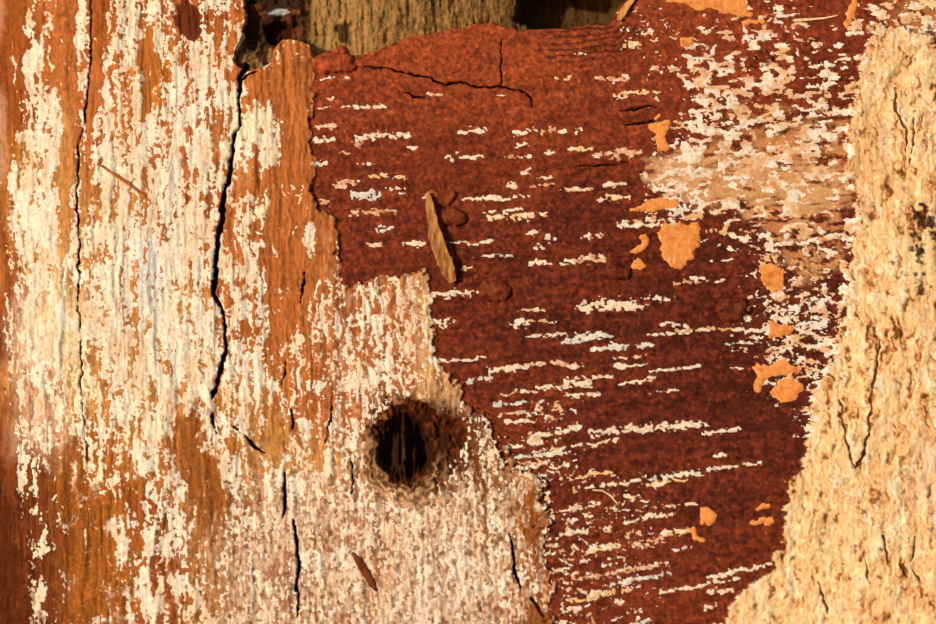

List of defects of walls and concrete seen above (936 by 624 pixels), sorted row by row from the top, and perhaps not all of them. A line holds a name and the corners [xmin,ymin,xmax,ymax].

crack [364,41,533,107]
crack [210,63,266,453]
crack [299,271,307,303]
peeling [0,0,659,624]
peeling [624,0,936,438]
crack [282,472,302,618]
peeling [686,507,717,542]
peeling [750,503,774,526]